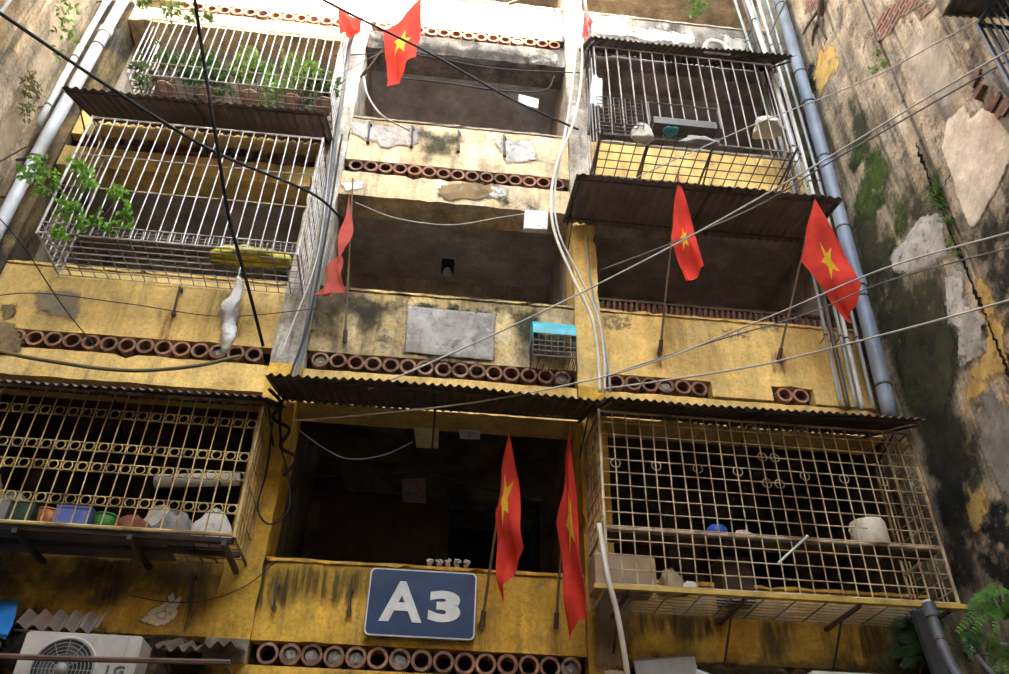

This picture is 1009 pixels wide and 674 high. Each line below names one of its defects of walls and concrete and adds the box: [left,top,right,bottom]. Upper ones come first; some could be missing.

spalling [863,0,935,41]
peeling [349,120,462,157]
peeling [492,136,538,164]
water stain [848,99,870,154]
flaking render [907,33,1009,230]
peeling [341,181,364,192]
peeling [438,182,510,205]
water stain [903,176,932,224]
crack [916,143,1009,382]
flaking render [889,213,987,372]
water stain [853,214,1009,590]
water stain [256,557,360,608]